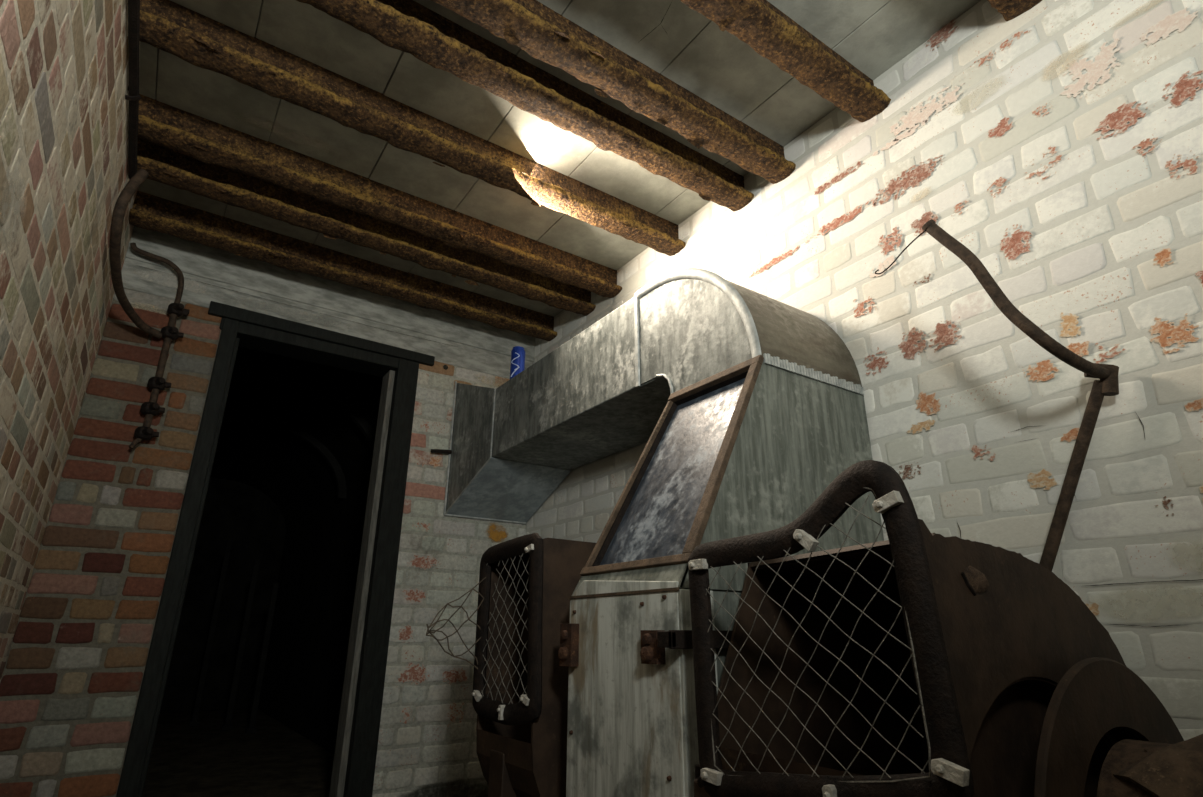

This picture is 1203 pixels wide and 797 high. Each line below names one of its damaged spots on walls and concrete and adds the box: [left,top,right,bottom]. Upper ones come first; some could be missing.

peeling [812,24,1035,198]
peeling [1093,70,1203,141]
peeling [1132,137,1162,158]
peeling [1165,150,1199,179]
peeling [748,155,943,278]
peeling [1000,224,1032,260]
peeling [863,317,962,376]
peeling [1149,313,1199,354]